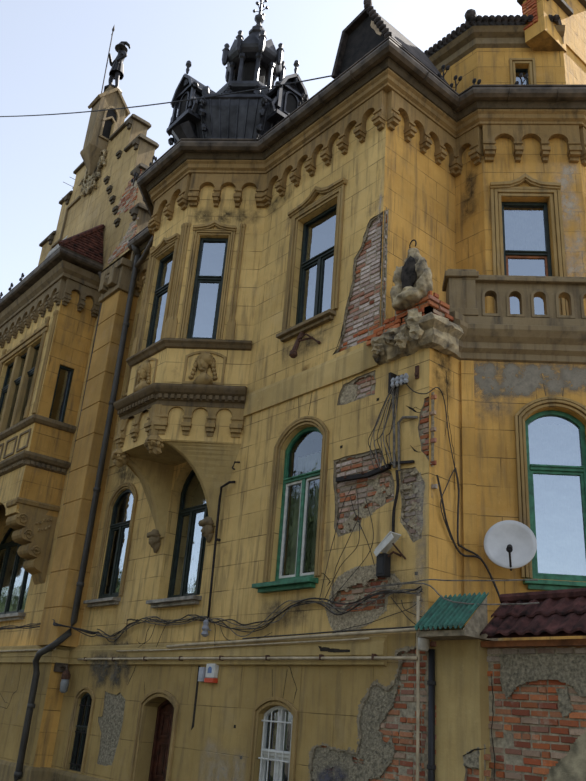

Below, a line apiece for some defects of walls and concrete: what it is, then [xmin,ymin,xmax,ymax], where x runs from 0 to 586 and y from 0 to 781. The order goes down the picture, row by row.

flaking render [522,0,538,31]
flaking render [108,217,139,264]
flaking render [334,207,389,354]
flaking render [338,371,379,405]
spalling [419,392,437,467]
flaking render [334,445,438,542]
flaking render [325,564,402,633]
peeling [98,692,125,766]
flaking render [308,640,436,781]